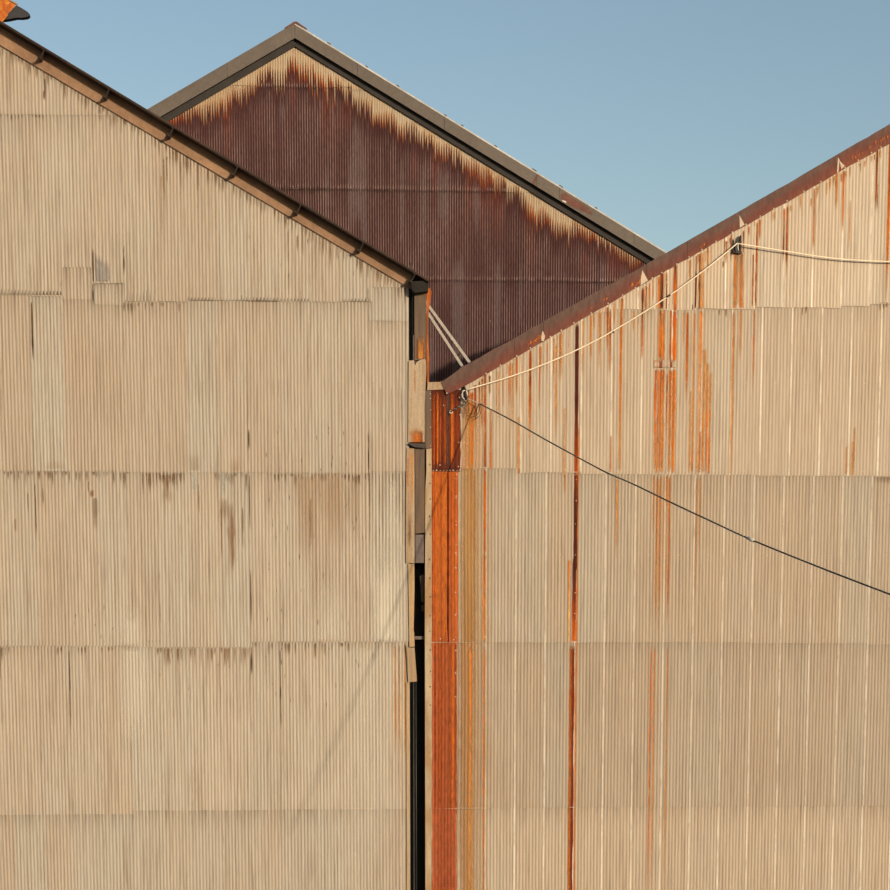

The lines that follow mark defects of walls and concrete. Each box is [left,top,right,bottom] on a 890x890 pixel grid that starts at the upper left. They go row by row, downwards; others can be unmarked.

rust [774,135,890,272]
rust [723,220,761,455]
rust [169,56,711,890]